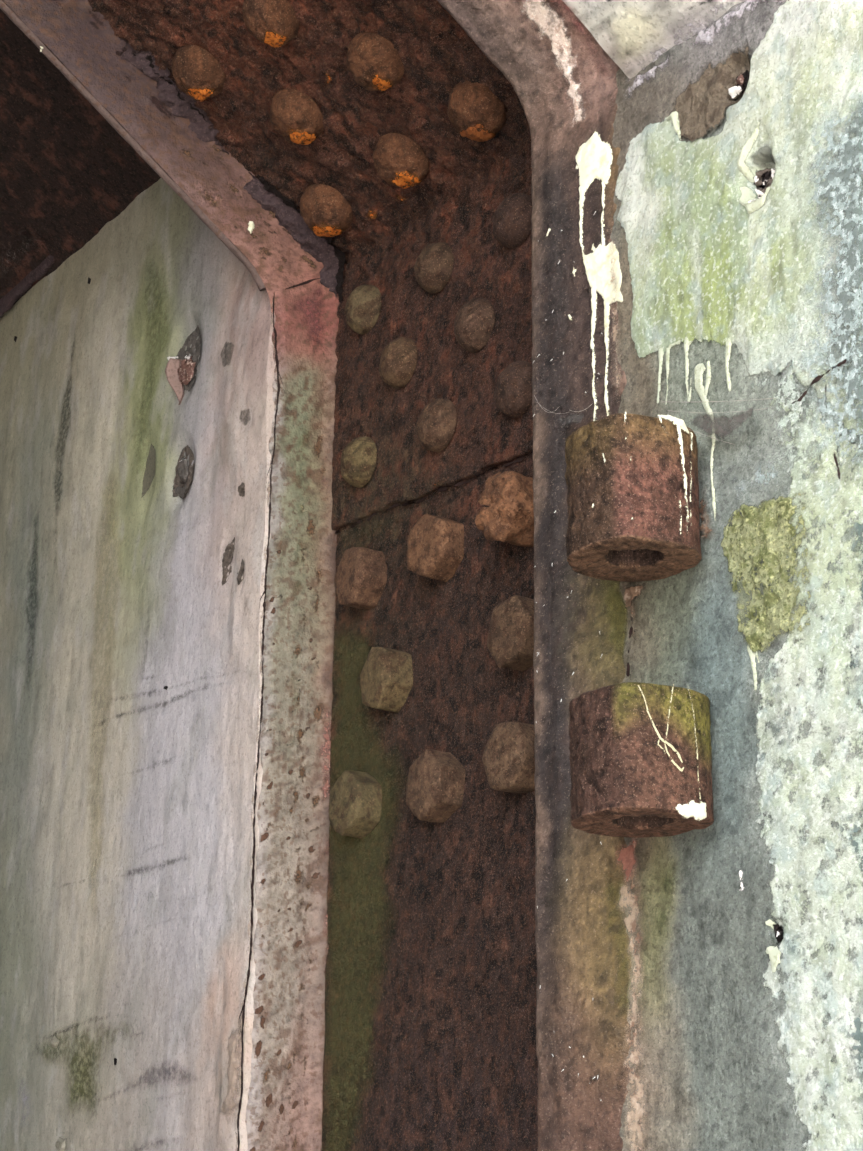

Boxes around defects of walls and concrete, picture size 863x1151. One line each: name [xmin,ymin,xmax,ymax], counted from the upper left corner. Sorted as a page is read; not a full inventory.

rust [264,31,287,48]
rust [116,39,229,160]
rust [289,129,316,145]
rust [372,74,393,91]
rust [392,171,422,201]
rust [205,172,346,340]
crack [335,429,533,534]
peeling [610,0,863,1151]
rust [288,703,323,832]
rust [277,865,320,947]
rust [254,1006,265,1057]
rust [261,1069,298,1114]